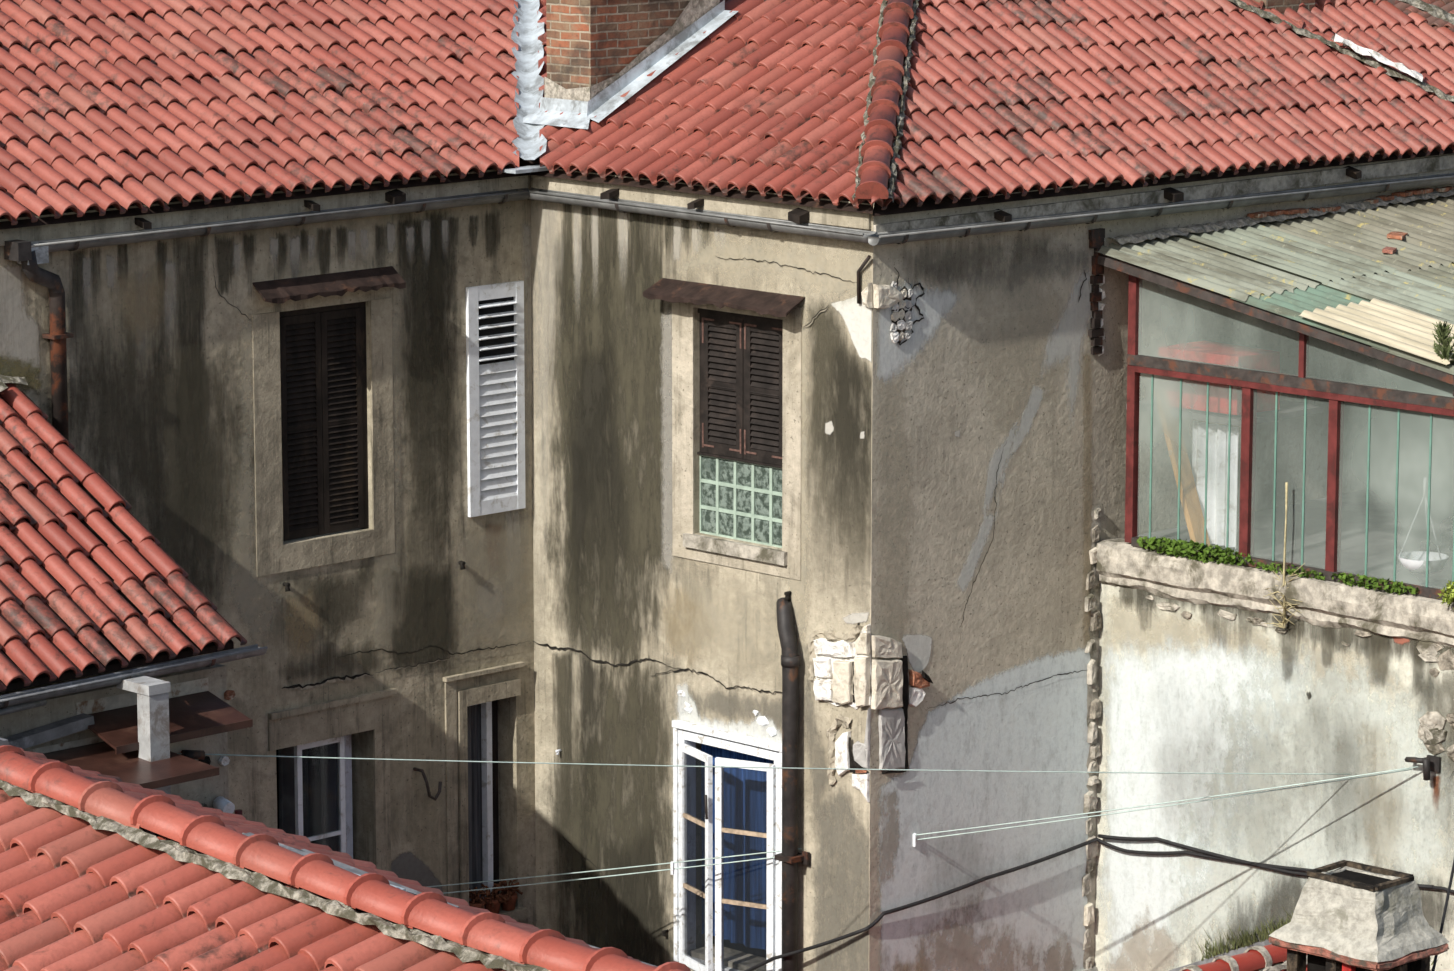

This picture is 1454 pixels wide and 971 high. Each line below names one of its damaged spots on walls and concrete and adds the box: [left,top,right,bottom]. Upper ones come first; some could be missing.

peeling [831,283,956,380]
water stain [68,213,497,641]
crack [282,641,782,694]
water stain [546,204,872,971]
crack [960,442,1007,638]
water stain [1121,587,1219,609]
water stain [1245,610,1421,661]
spalling [1393,637,1454,678]
spalling [808,612,933,882]
peeling [900,508,1178,971]
spalling [1418,699,1454,761]
water stain [1218,875,1302,955]